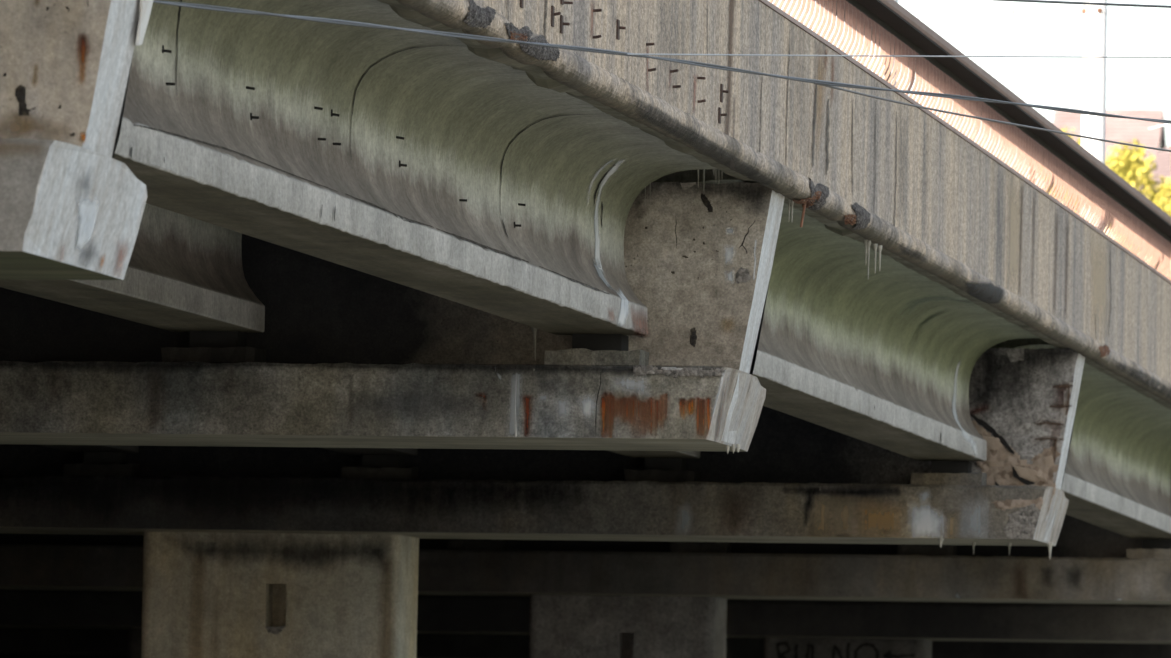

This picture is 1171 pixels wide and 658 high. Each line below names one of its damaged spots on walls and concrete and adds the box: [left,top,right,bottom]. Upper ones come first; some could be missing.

spalling [464,0,560,61]
rust [78,35,88,80]
spalling [793,178,830,210]
spalling [844,202,871,230]
rust [523,395,531,436]
rust [601,384,727,438]
spalling [970,382,1073,539]
leakage [784,488,899,537]
leakage [913,493,955,538]